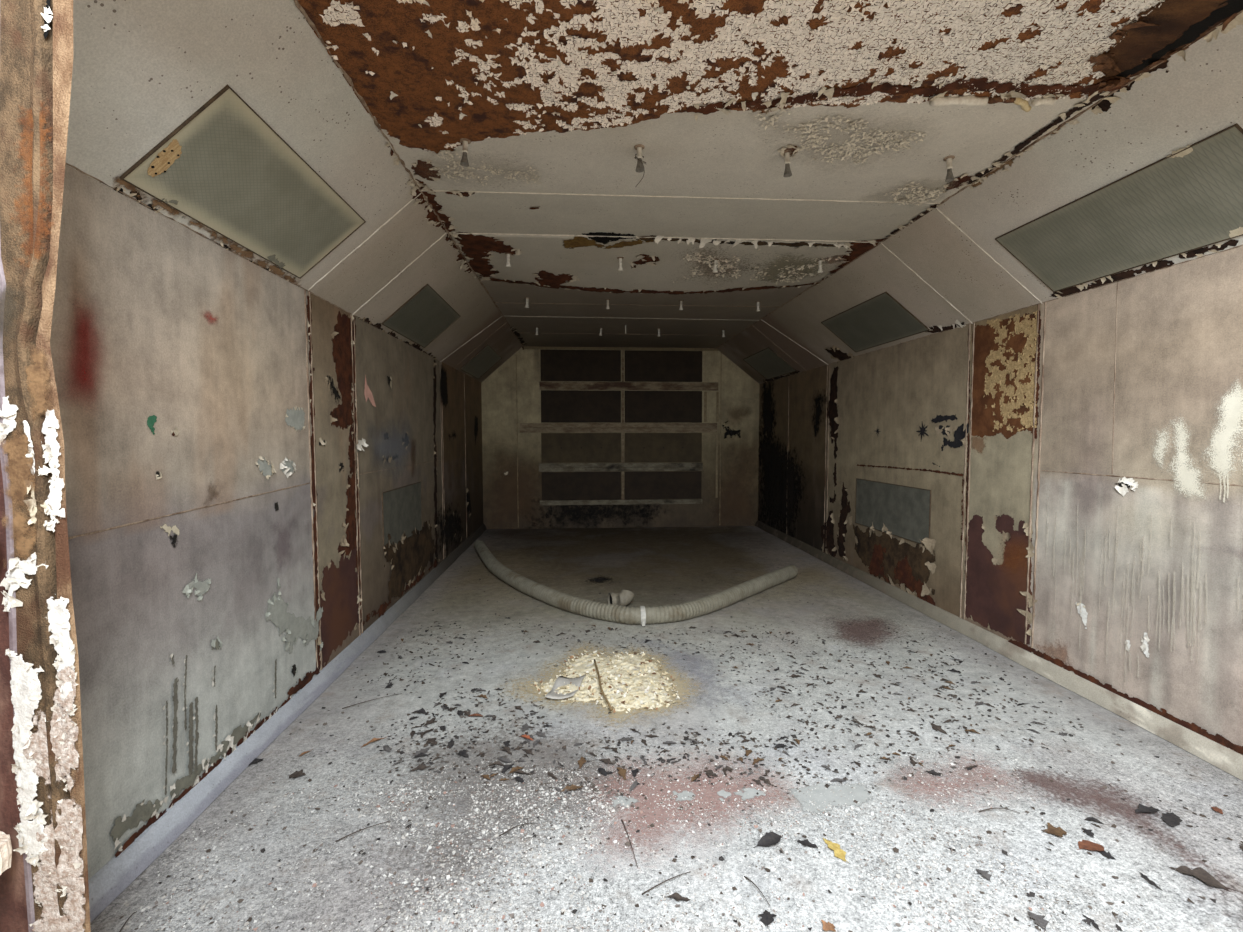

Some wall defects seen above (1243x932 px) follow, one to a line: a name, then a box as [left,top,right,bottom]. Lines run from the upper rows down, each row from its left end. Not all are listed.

peeling [298,0,1166,273]
peeling [635,235,852,285]
peeling [925,310,1039,467]
peeling [0,396,65,612]
peeling [337,463,360,559]
peeling [965,514,1037,645]
peeling [1124,632,1150,658]
damp [1219,474,1229,502]
peeling [5,594,86,932]
damp [162,653,218,795]